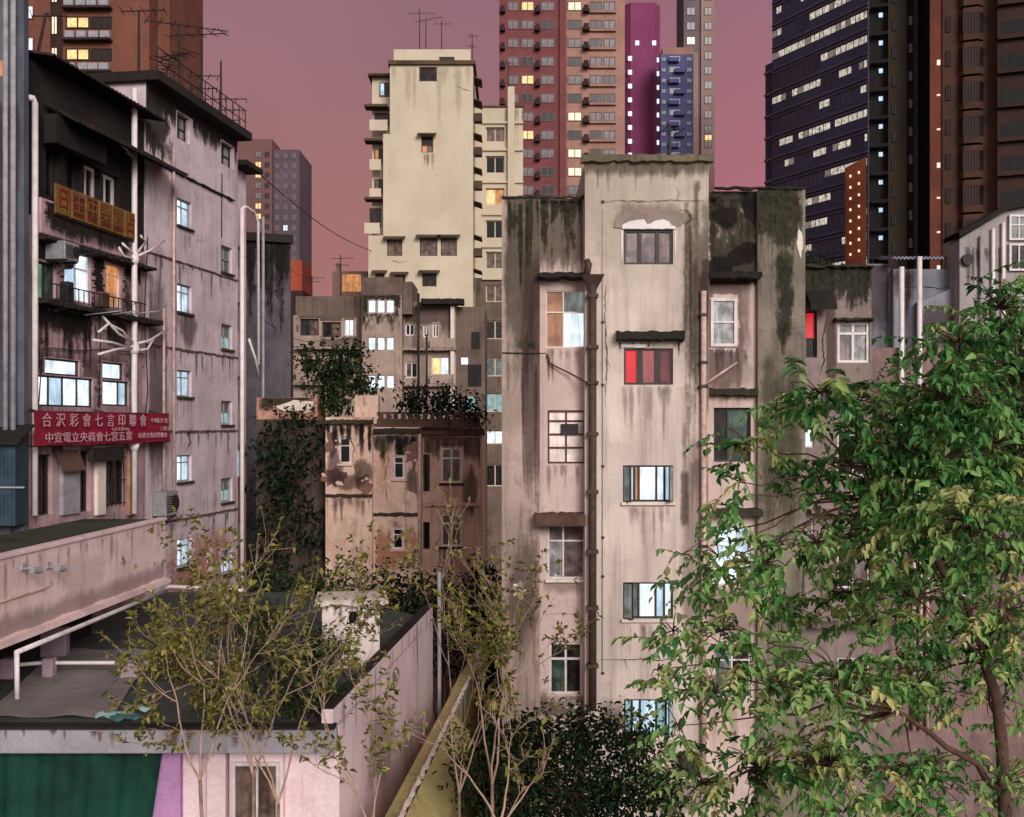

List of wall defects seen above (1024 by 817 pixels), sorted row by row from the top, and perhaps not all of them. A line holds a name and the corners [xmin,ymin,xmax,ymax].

peeling [614,211,687,260]
damp [38,202,142,403]
damp [505,198,583,474]
damp [678,185,914,407]
crack [819,320,827,374]
peeling [321,429,392,495]
damp [325,425,480,512]